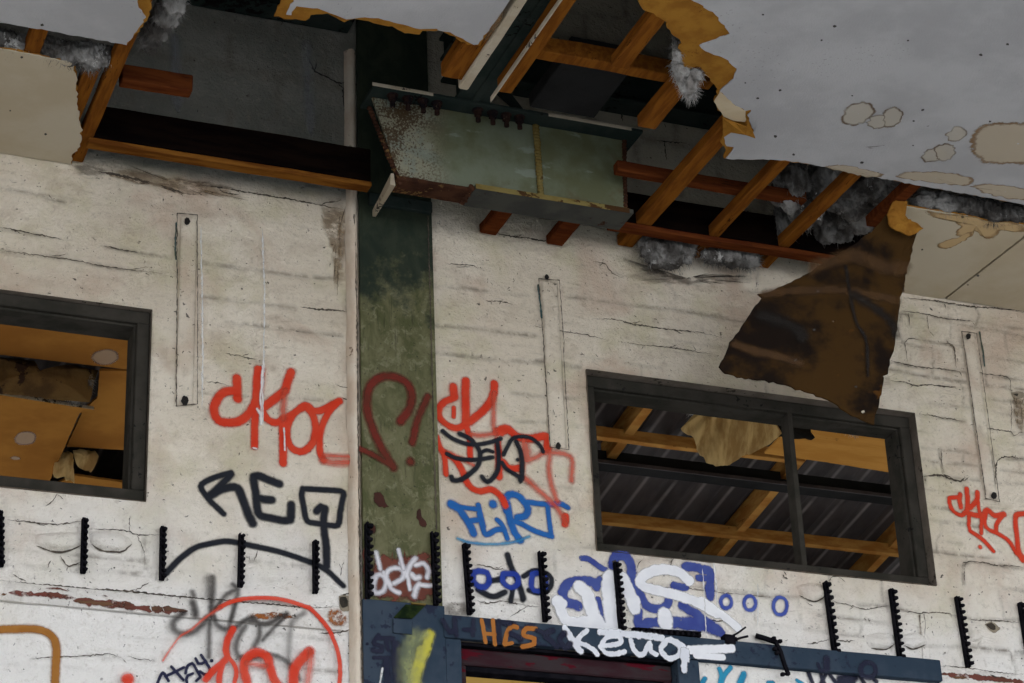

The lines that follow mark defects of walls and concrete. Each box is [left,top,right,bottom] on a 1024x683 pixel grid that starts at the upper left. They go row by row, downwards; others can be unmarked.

leakage [841,102,904,129]
leakage [825,122,1024,200]
leakage [927,211,1024,249]
crack [0,171,364,683]